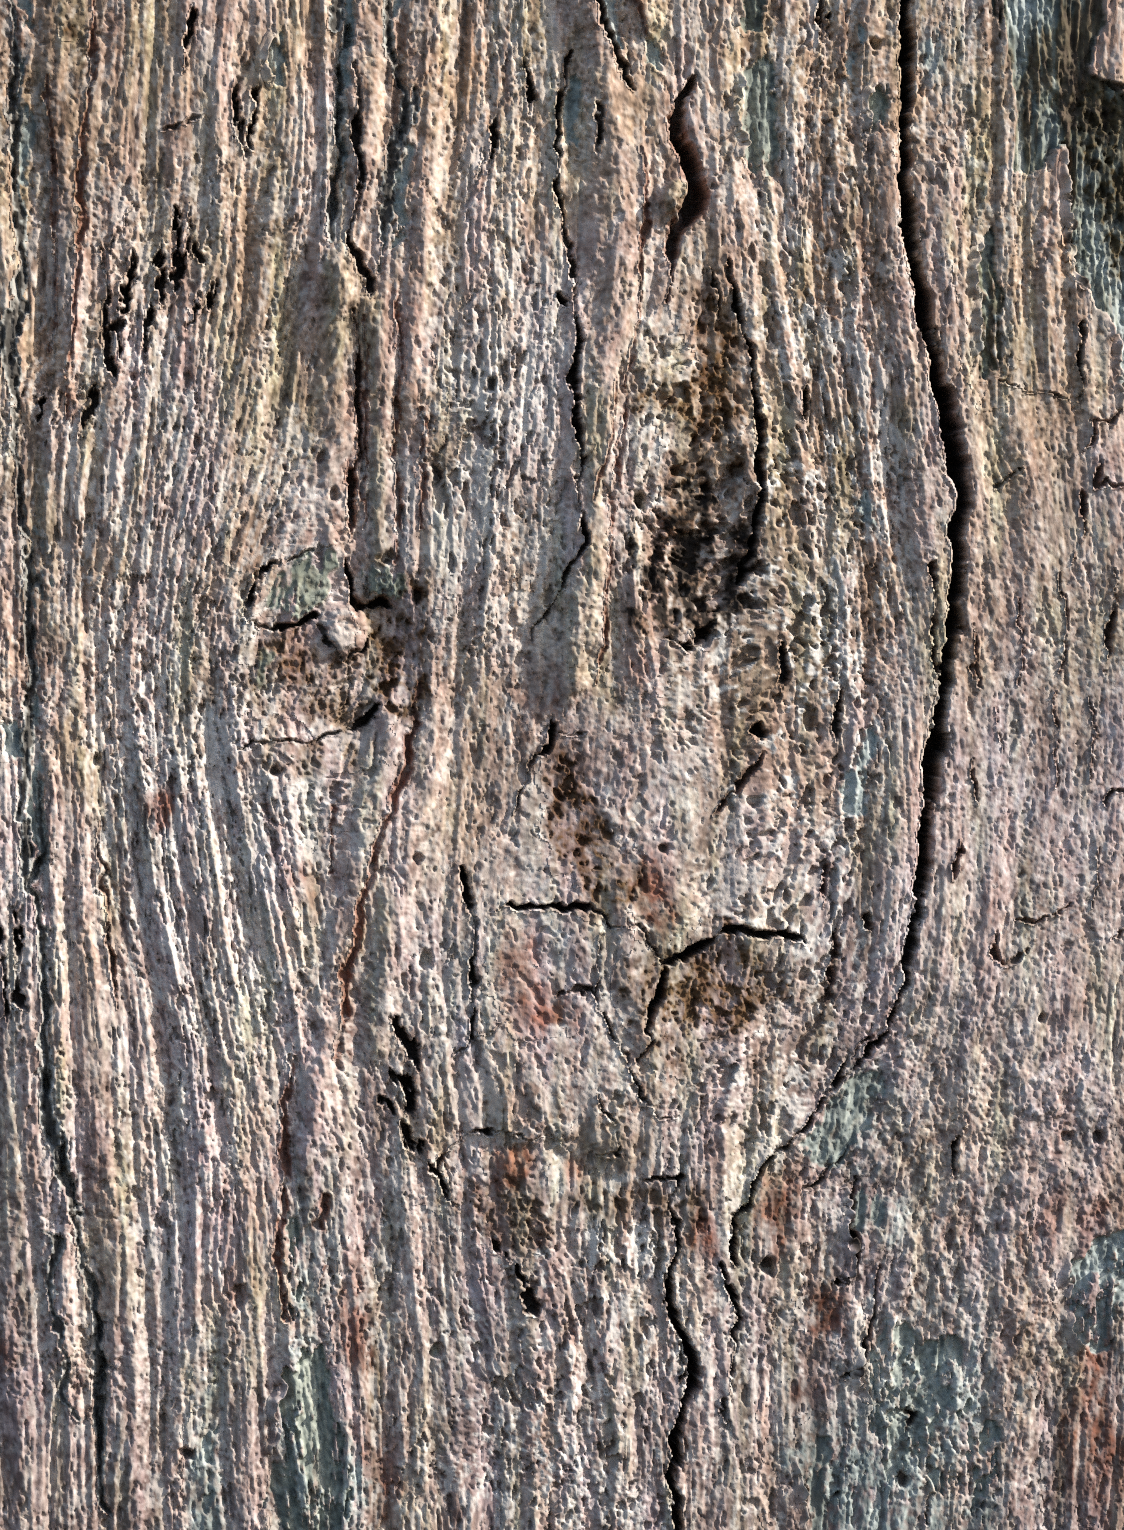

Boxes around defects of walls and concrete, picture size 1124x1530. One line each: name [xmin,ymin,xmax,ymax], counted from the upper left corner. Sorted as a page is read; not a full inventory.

crack [160,113,205,132]
peeling [964,0,1124,420]
crack [0,0,137,1520]
crack [237,0,429,1324]
damp [138,251,779,833]
crack [418,0,1124,1530]
spalling [989,930,1038,968]
peeling [1058,1237,1124,1357]